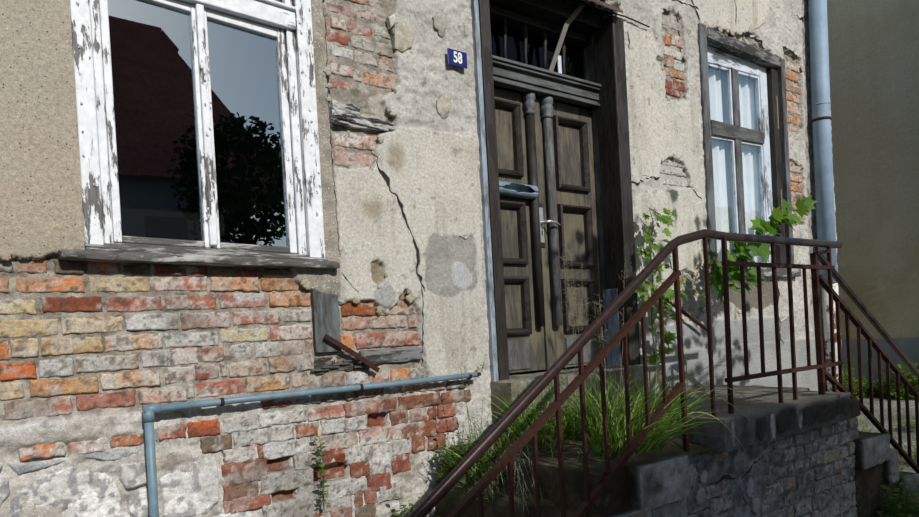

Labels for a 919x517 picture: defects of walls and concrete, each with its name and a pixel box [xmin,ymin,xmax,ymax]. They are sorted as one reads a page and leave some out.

flaking render [313,0,397,103]
flaking render [660,6,689,101]
crack [661,0,700,75]
flaking render [785,48,805,140]
flaking render [333,131,384,168]
crack [631,98,660,185]
flaking render [790,160,805,223]
crack [370,150,426,363]
flaking render [0,254,471,517]